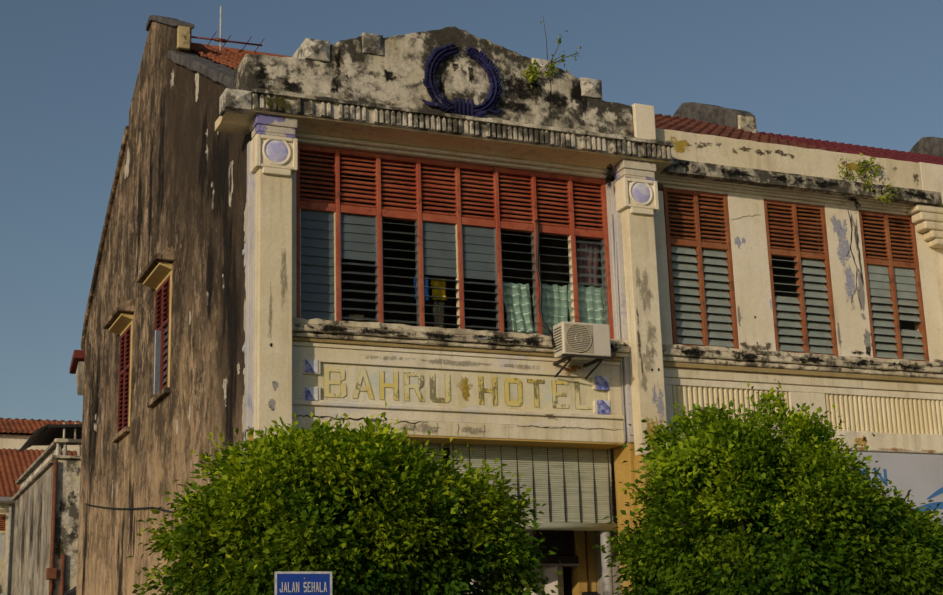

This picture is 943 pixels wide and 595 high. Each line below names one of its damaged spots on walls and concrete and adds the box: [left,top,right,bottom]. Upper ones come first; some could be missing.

water stain [255,62,302,111]
water stain [331,49,361,93]
water stain [500,72,587,115]
water stain [137,98,165,276]
water stain [870,174,934,200]
water stain [199,116,240,446]
peeling [831,216,872,350]
crack [846,211,862,309]
water stain [473,335,545,346]
water stain [682,342,771,360]
water stain [844,347,943,370]
water stain [59,350,100,595]